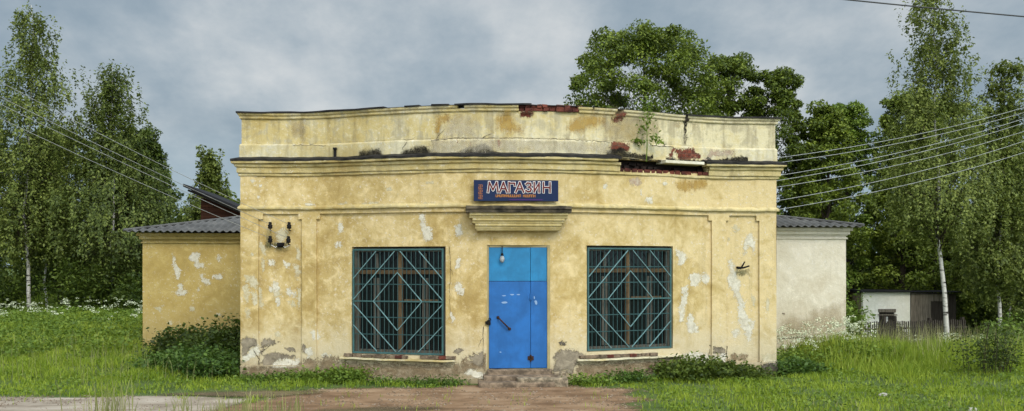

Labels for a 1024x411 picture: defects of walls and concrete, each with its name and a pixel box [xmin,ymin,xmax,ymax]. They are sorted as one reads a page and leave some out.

flaking render [518,104,579,118]
flaking render [609,140,734,204]
peeling [418,202,434,242]
peeling [170,252,223,311]
peeling [675,248,710,334]
peeling [727,224,769,341]
spalling [240,329,486,379]
spalling [552,340,748,378]